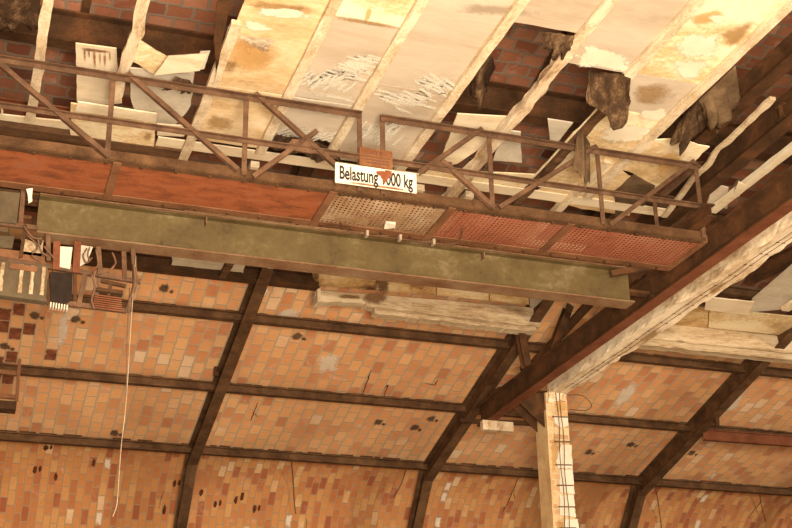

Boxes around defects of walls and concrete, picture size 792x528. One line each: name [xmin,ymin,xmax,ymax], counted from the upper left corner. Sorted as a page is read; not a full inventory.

leakage [695,11,720,23]
leakage [726,25,749,44]
leakage [225,42,269,72]